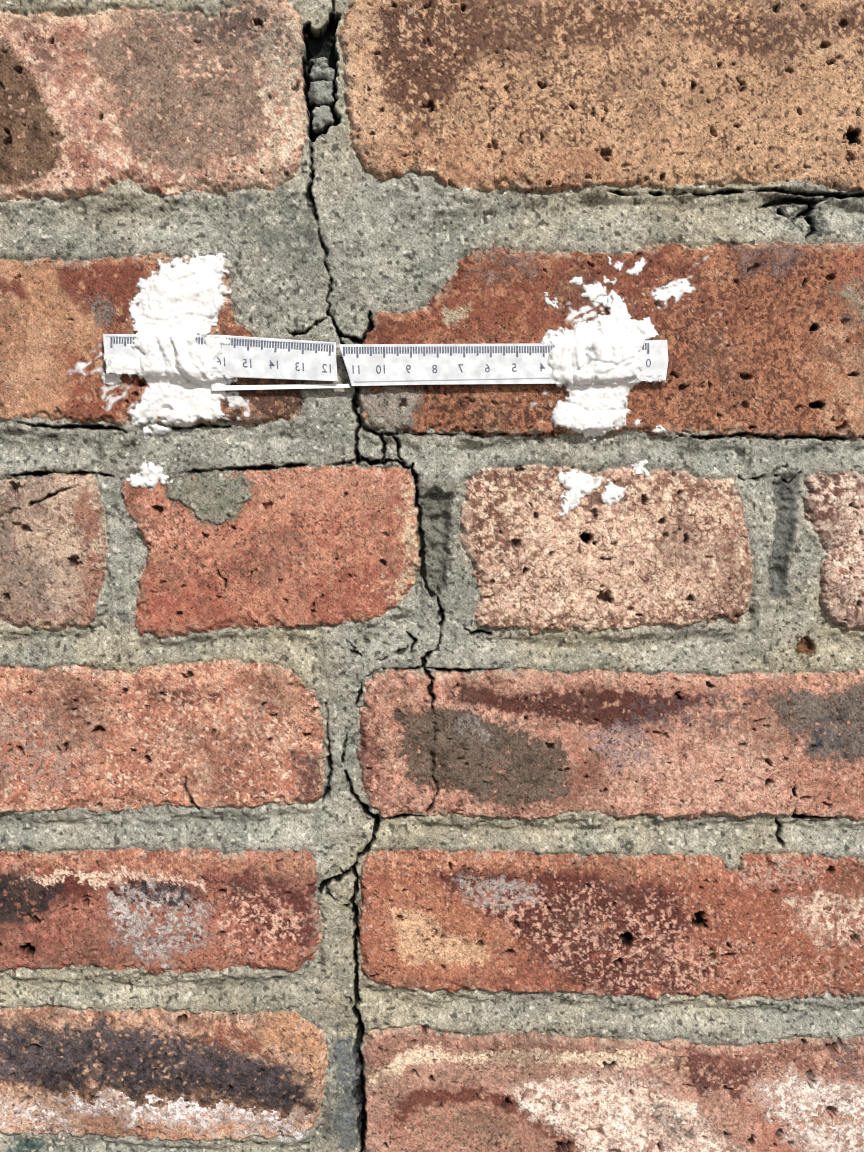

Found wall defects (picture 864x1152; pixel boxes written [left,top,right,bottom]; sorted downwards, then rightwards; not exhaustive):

crack [188,0,544,708]
crack [610,188,864,239]
crack [676,432,863,483]
crack [318,703,438,1152]